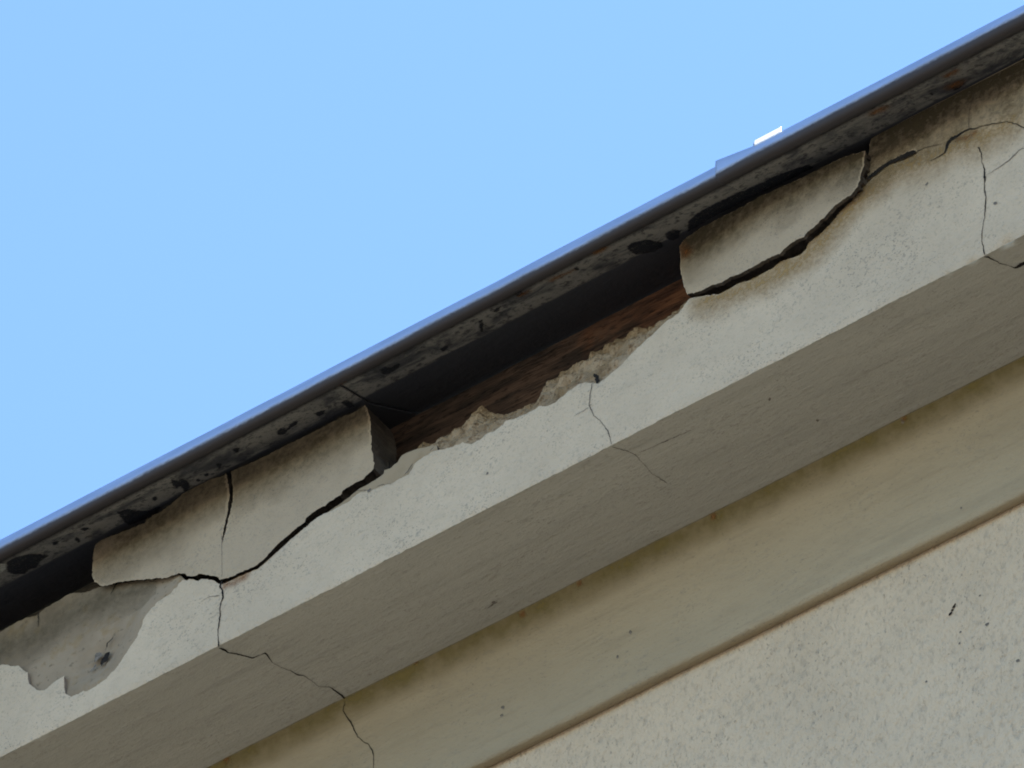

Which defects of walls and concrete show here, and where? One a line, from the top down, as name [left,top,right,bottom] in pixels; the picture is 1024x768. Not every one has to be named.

peeling [628,165,813,255]
crack [867,92,1024,269]
flaking render [327,301,687,513]
crack [586,384,691,482]
peeling [0,541,59,574]
peeling [118,497,159,525]
flaking render [0,574,185,697]
crack [207,575,374,768]